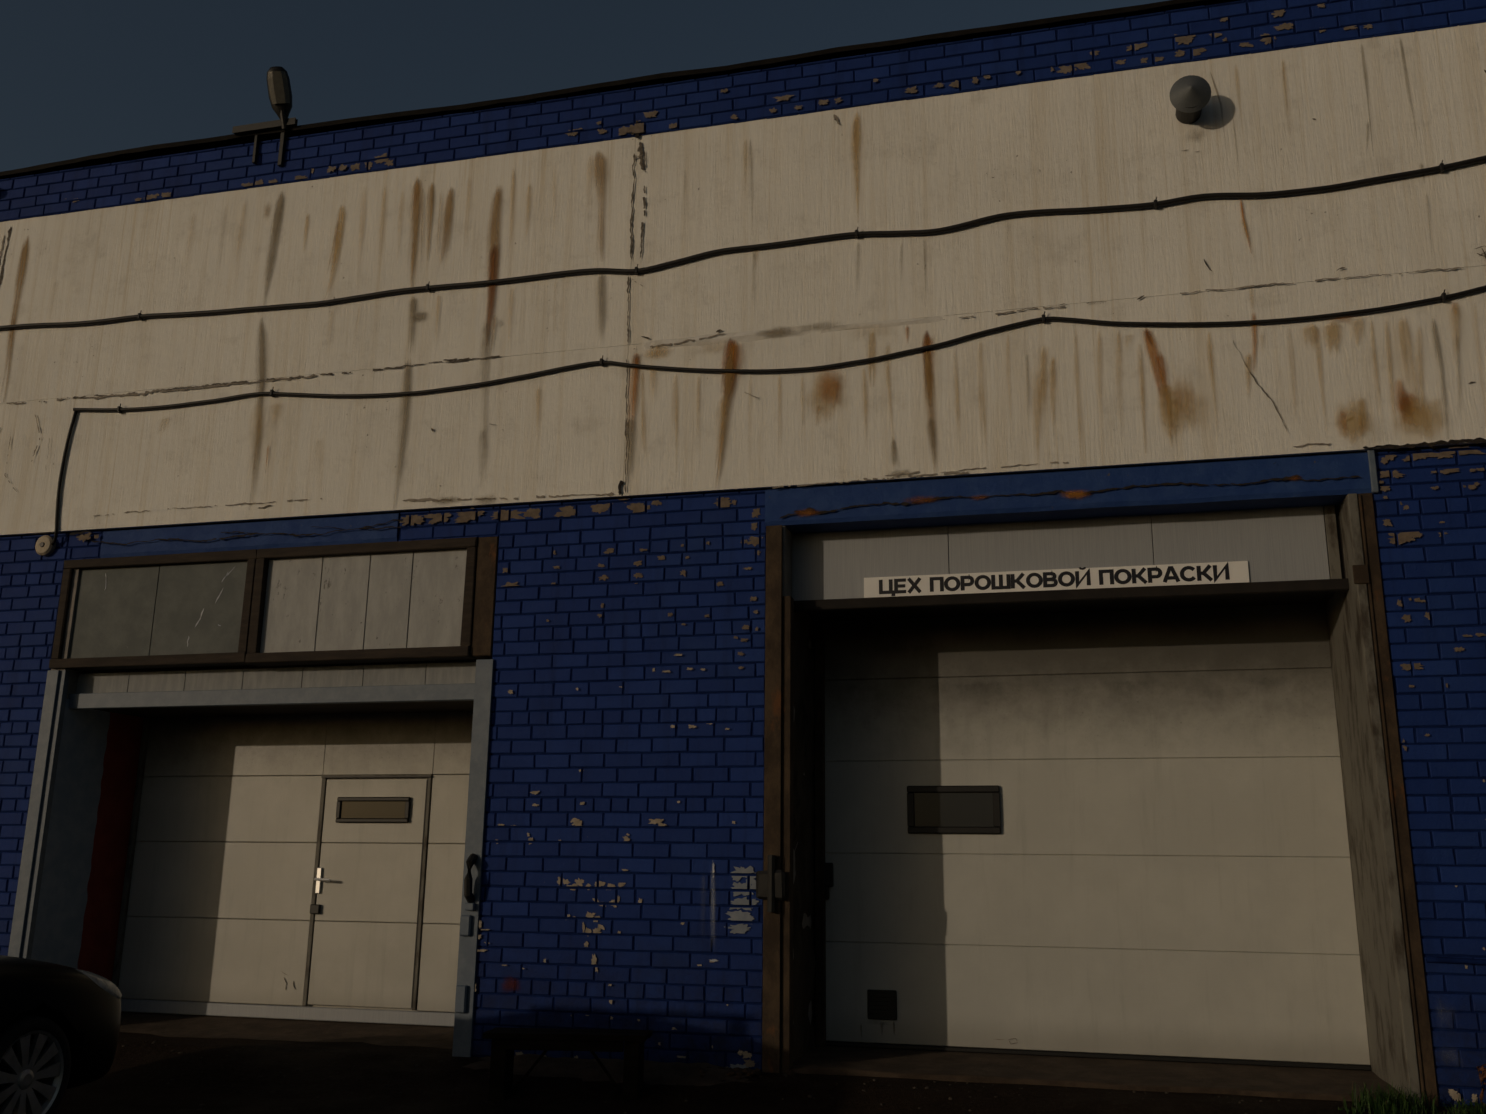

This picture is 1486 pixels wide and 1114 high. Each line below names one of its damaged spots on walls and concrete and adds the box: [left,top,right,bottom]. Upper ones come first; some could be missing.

peeling [1115,9,1293,64]
peeling [565,110,677,138]
peeling [769,95,842,125]
rust [411,180,452,271]
rust [717,339,736,474]
rust [1145,331,1171,435]
rust [1399,394,1431,429]
peeling [399,498,662,526]
peeling [1378,446,1486,545]
peeling [712,864,759,934]
peeling [557,869,628,1020]
spalling [1448,1064,1486,1105]